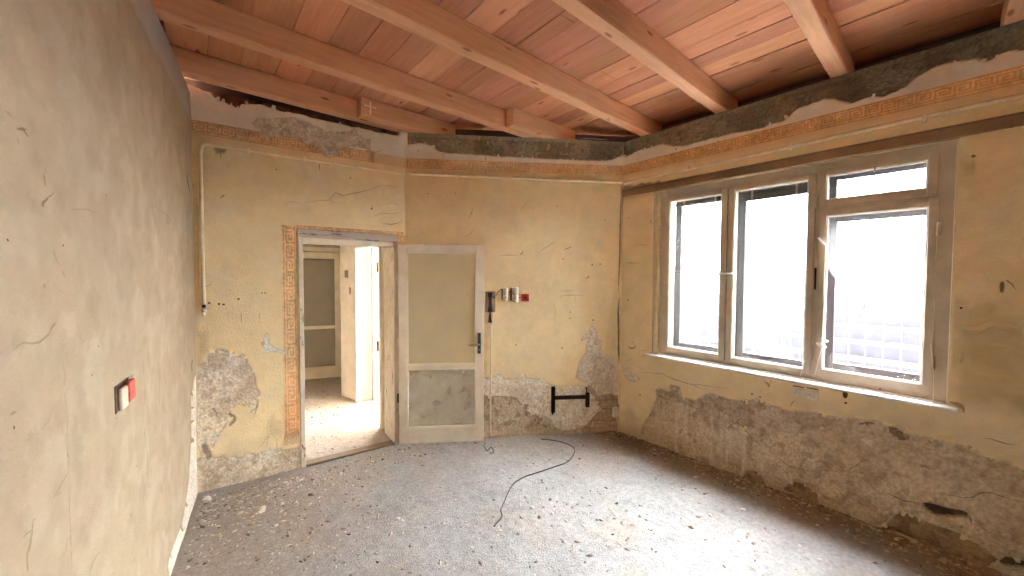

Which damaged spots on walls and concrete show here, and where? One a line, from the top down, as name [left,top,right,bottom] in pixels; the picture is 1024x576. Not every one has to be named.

flaking render [647,386,1024,576]